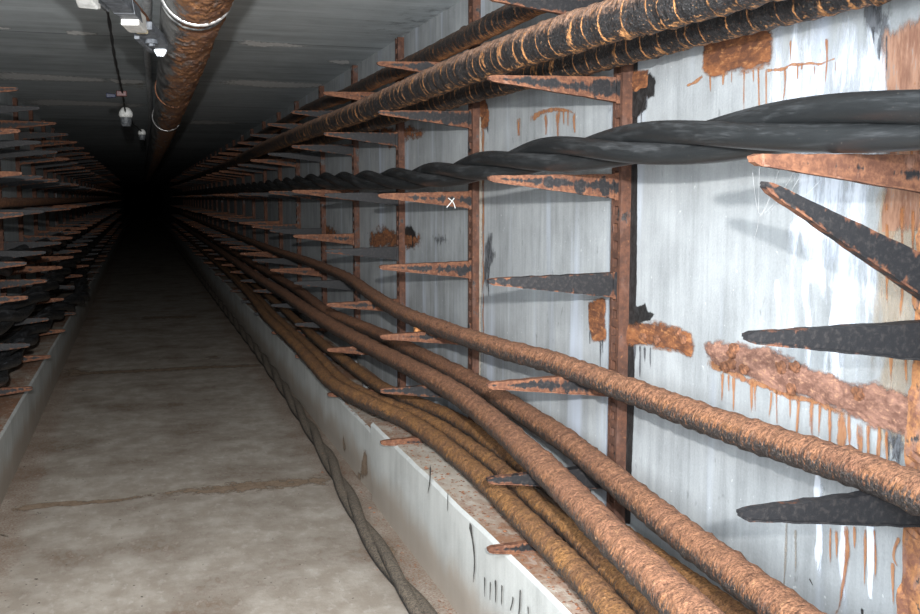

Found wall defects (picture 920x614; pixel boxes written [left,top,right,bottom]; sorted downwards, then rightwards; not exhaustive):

rust [687,30,772,106]
rust [884,18,920,90]
rust [532,107,576,136]
rust [369,225,420,249]
rust [880,188,920,248]
rust [588,298,606,366]
rust [626,322,694,374]